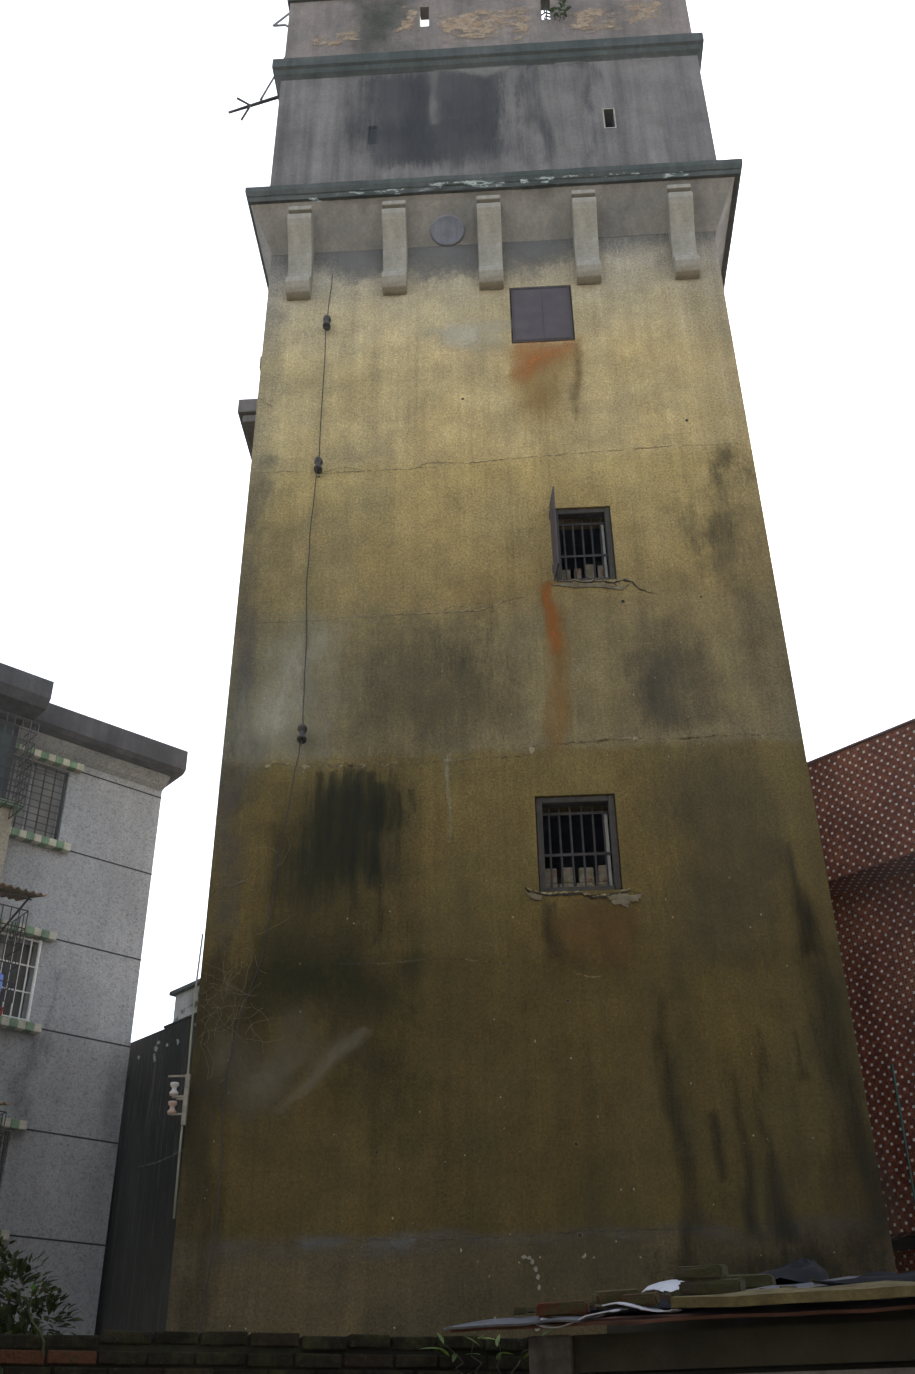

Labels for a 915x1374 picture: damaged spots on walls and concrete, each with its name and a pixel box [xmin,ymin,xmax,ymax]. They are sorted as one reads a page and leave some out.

damp [359,71,498,161]
spalling [606,893,643,909]